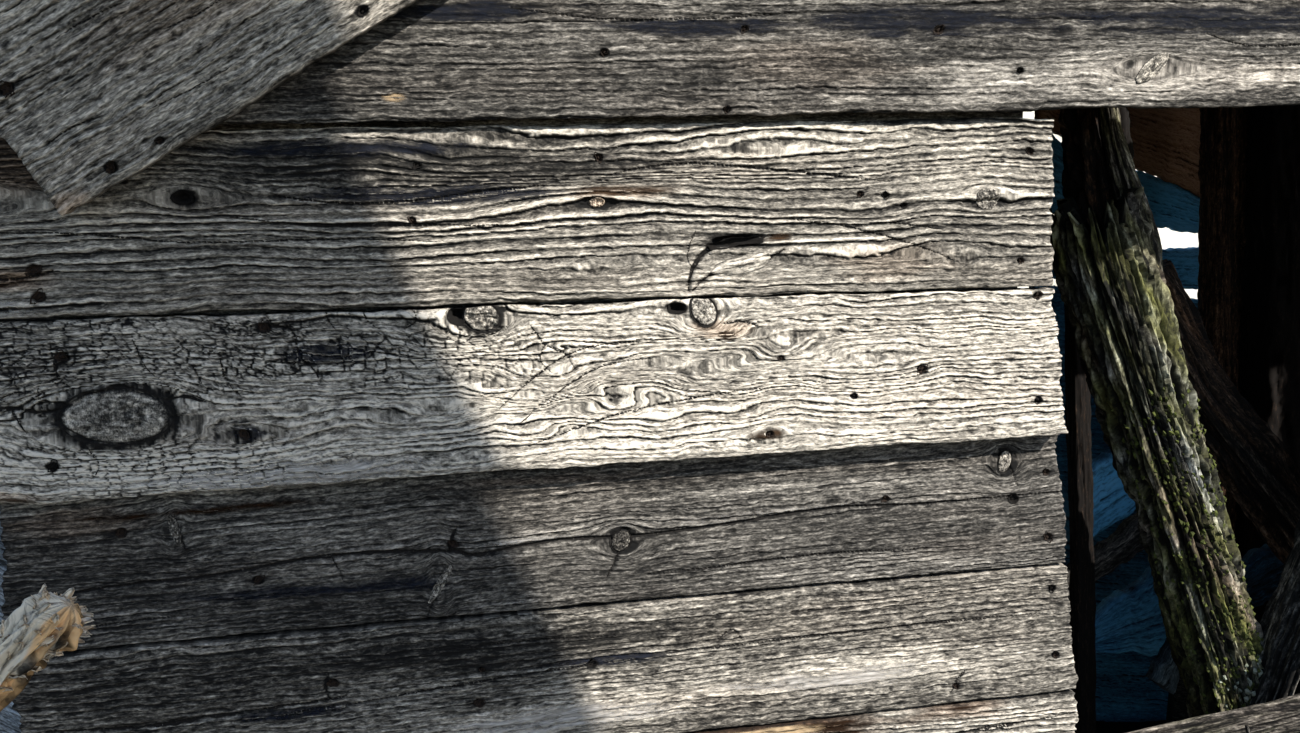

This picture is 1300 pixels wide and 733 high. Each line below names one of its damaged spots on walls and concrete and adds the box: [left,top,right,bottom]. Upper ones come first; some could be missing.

crack [687,218,957,328]
crack [267,317,331,383]
crack [0,337,237,477]